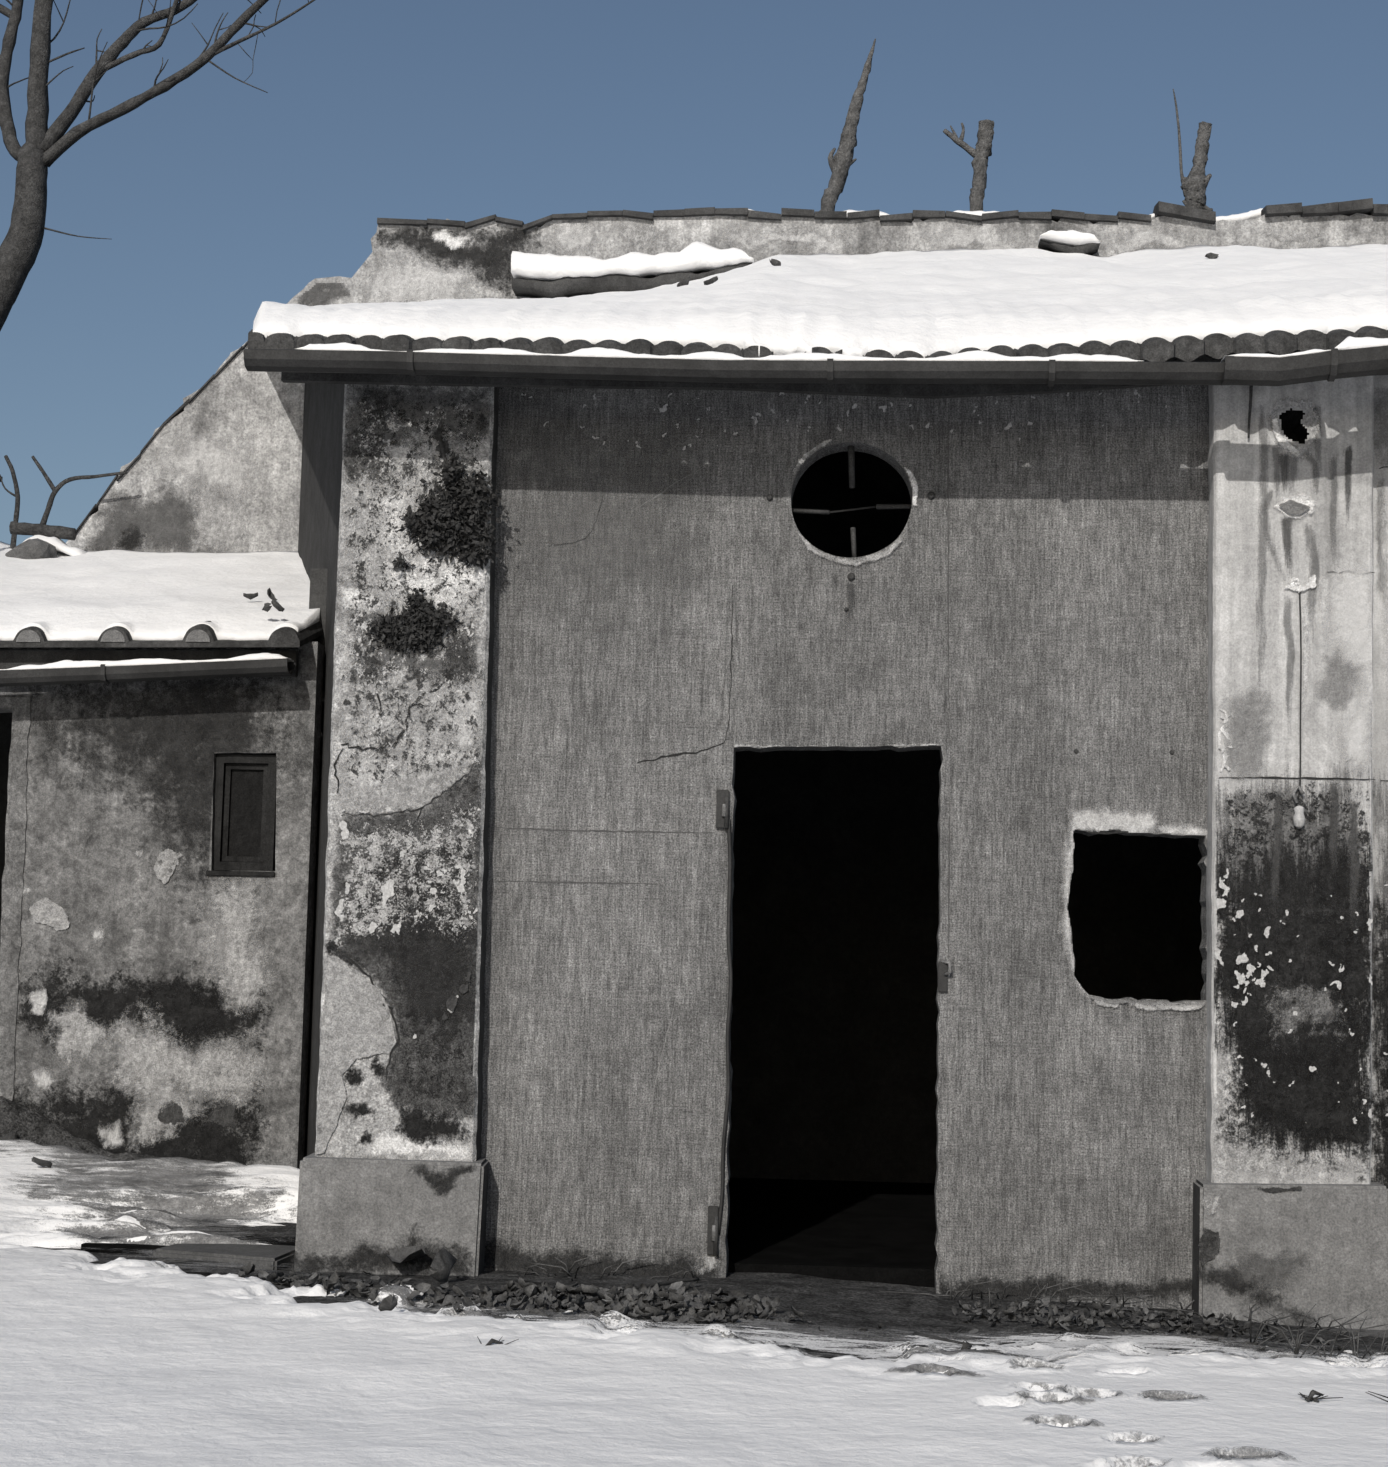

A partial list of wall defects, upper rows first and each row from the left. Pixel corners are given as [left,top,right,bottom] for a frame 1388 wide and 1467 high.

flaking render [1269,398,1320,459]
water stain [86,489,197,551]
flaking render [1274,494,1316,518]
water stain [1259,409,1357,708]
crack [637,564,733,763]
water stain [328,385,491,1195]
water stain [16,677,310,1052]
peeling [335,882,350,921]
peeling [367,879,401,935]
peeling [416,862,478,919]
water stain [1214,691,1388,1188]
water stain [13,1066,269,1166]